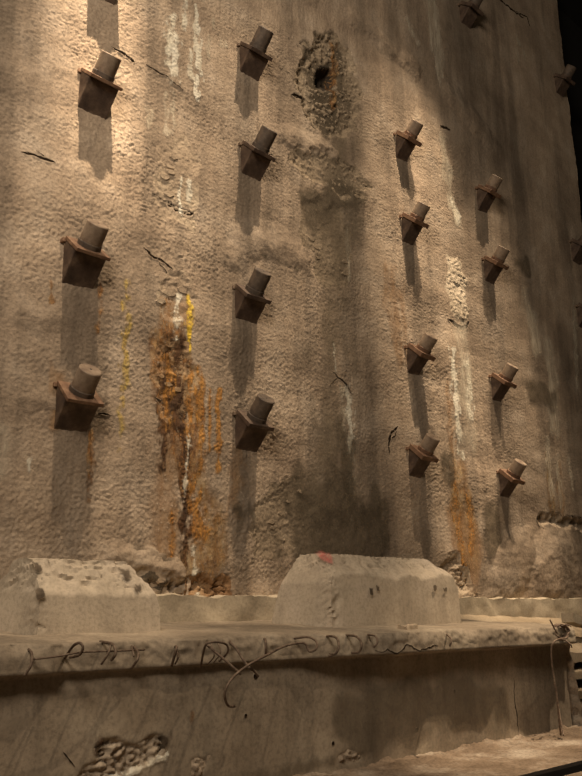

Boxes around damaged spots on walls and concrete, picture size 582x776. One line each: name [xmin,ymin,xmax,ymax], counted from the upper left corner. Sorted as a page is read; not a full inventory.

leakage [165,0,210,101]
spalling [293,30,363,140]
crack [499,0,531,28]
rust [150,298,226,595]
leakage [441,347,475,484]
rust [450,458,478,584]
spalling [537,511,582,533]
spalling [23,640,145,676]
spalling [200,636,318,708]
spalling [79,734,169,776]